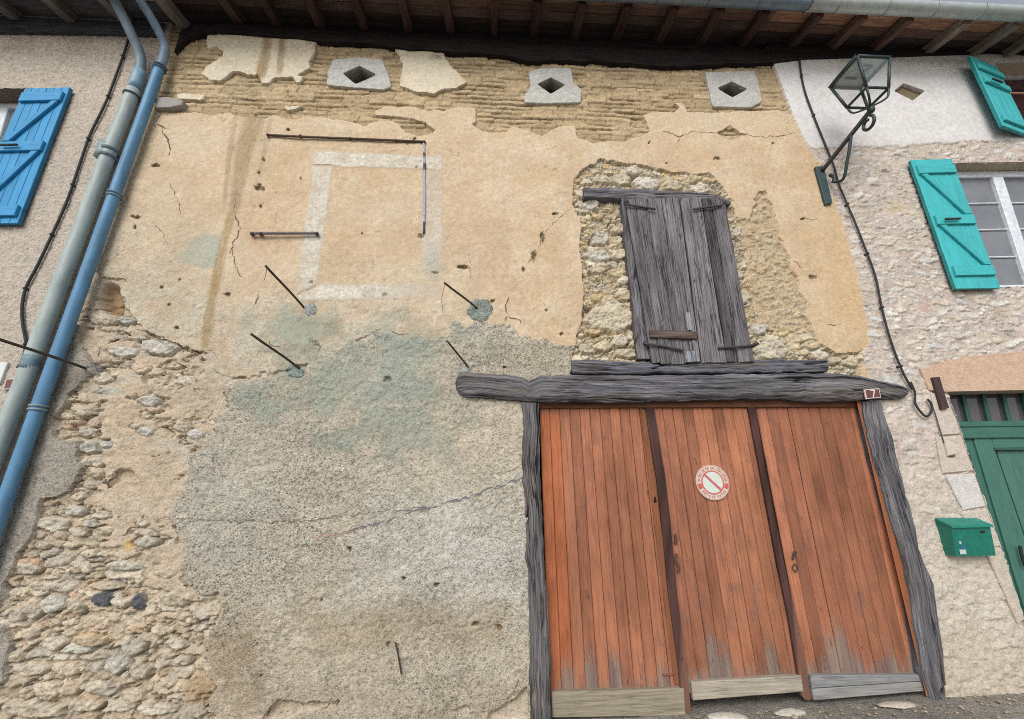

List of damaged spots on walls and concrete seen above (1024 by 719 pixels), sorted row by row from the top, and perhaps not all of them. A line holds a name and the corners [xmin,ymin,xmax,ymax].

spalling [158,25,793,144]
crack [229,199,258,303]
spalling [560,158,865,376]
spalling [0,270,308,719]
crack [123,477,523,539]
spalling [488,687,531,719]